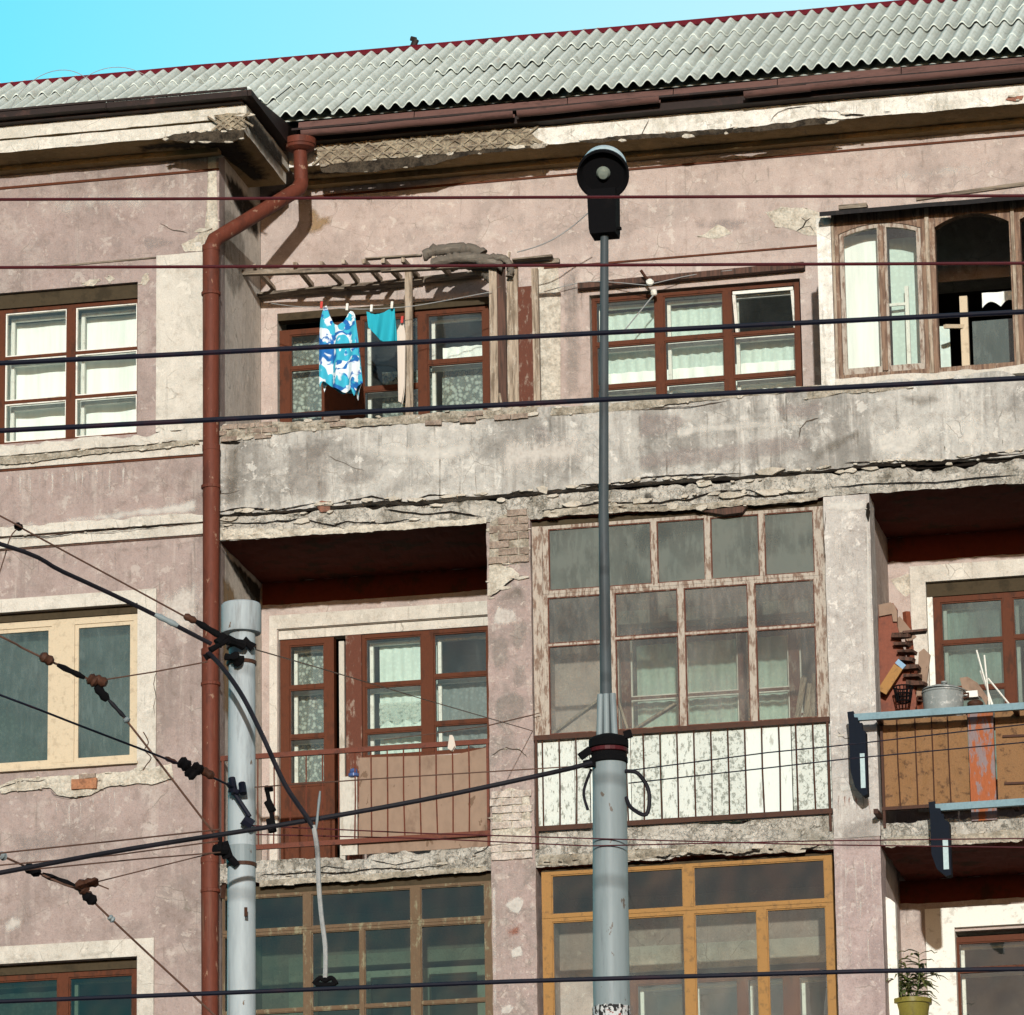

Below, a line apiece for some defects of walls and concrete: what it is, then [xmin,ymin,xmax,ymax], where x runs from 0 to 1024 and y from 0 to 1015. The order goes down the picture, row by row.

spalling [579,117,845,143]
spalling [312,125,549,173]
peeling [698,225,732,239]
peeling [765,207,828,236]
spalling [542,496,819,518]
flaking render [220,509,531,596]
spalling [0,764,173,798]
flaking render [259,788,593,887]
spalling [628,841,831,861]